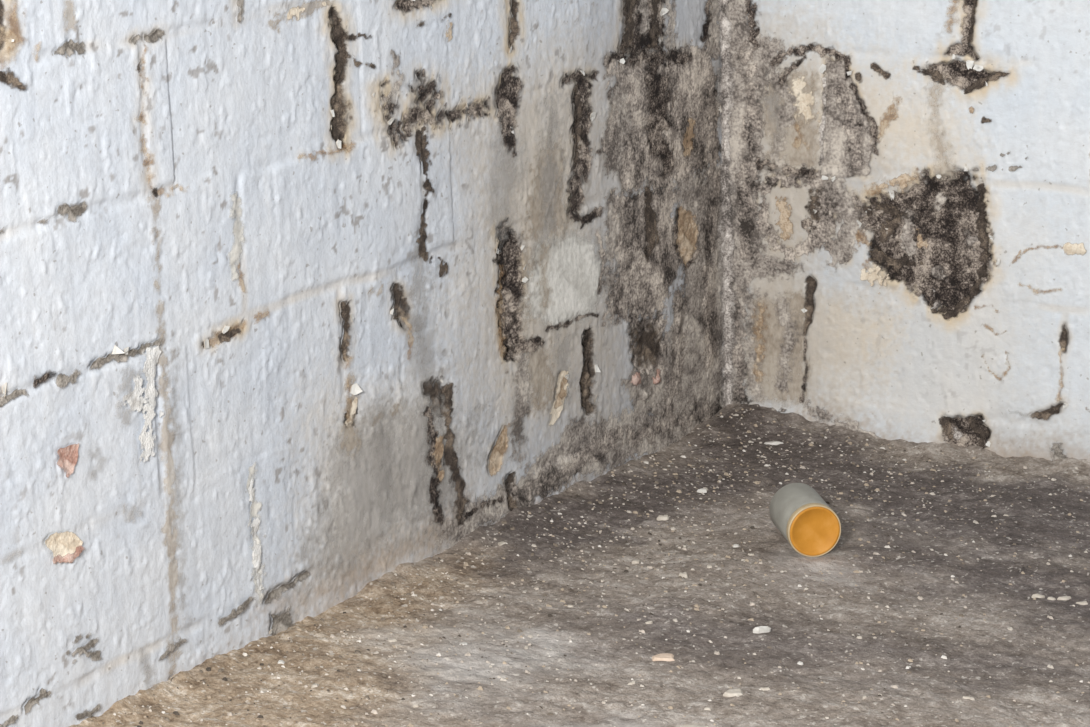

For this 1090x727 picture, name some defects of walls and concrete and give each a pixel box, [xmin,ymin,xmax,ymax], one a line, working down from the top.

spalling [395,0,435,27]
spalling [383,50,404,102]
spalling [770,43,1086,319]
damp [423,0,880,547]
spalling [488,218,545,476]
peeling [0,339,164,462]
spalling [938,415,991,449]
peeling [57,443,79,477]
peeling [45,531,84,564]